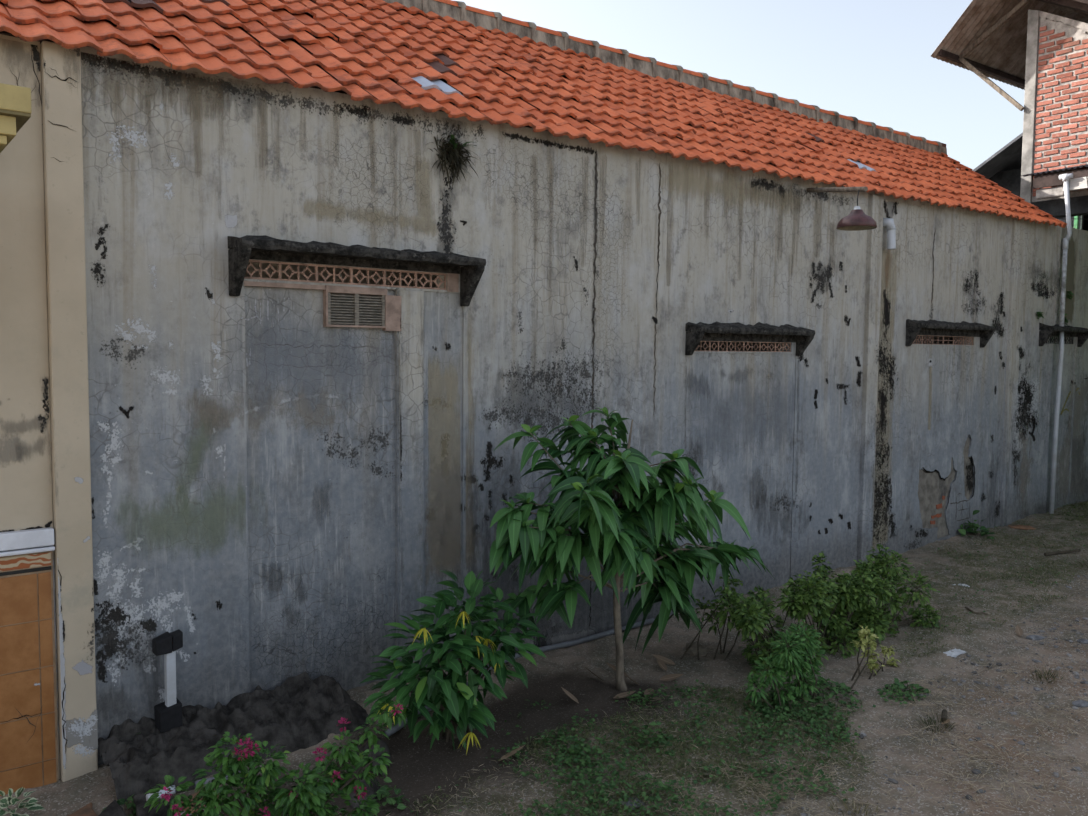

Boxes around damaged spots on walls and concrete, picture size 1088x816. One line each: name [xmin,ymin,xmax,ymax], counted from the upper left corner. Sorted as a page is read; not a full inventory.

water stain [437,173,456,254]
crack [653,164,662,411]
water stain [809,261,847,309]
water stain [317,415,402,491]
water stain [439,338,604,536]
water stain [871,289,928,550]
spalling [918,435,975,539]
peeling [53,558,98,769]